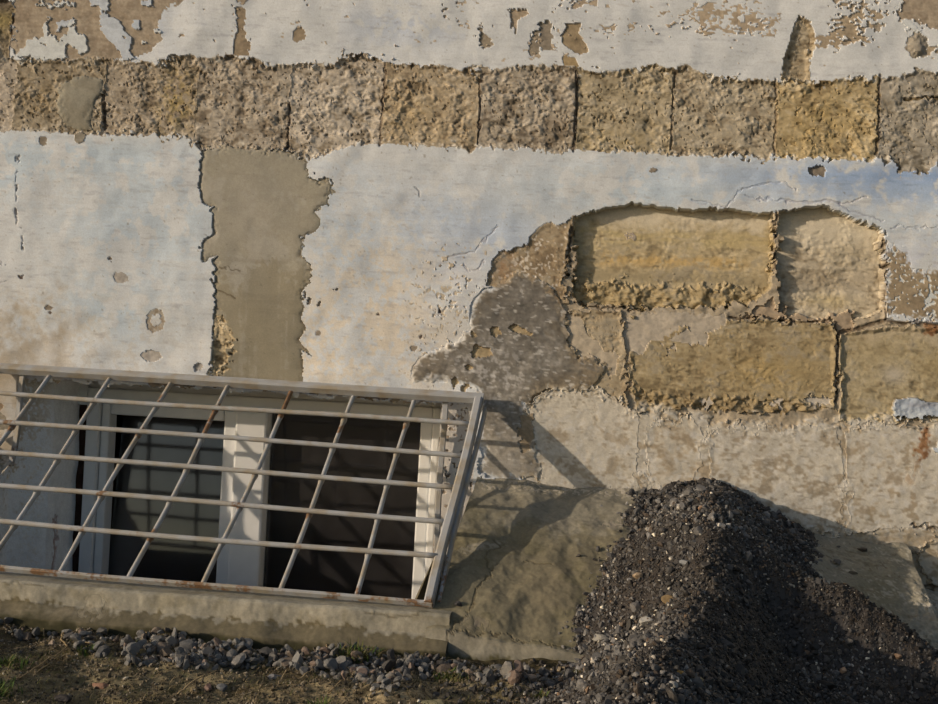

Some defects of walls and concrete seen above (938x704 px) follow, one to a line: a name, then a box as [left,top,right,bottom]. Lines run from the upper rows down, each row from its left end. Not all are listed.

spalling [0,0,938,178]
spalling [194,315,238,376]
peeling [408,243,472,356]
spalling [484,202,938,591]
crack [911,522,938,530]
crack [446,539,567,654]